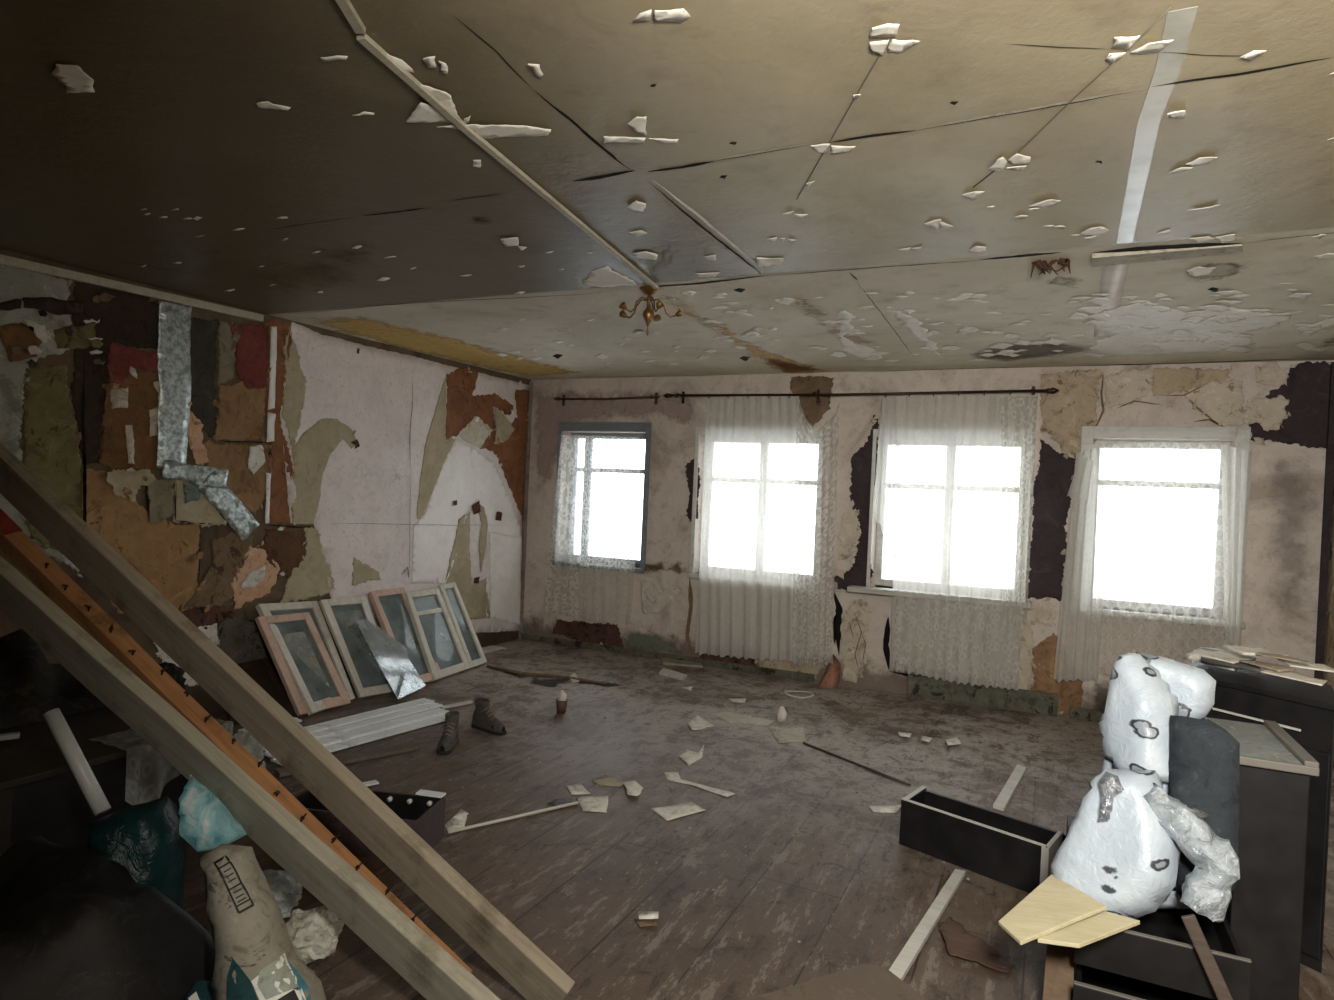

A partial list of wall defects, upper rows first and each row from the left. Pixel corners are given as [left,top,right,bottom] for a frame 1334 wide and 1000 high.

crack [268,193,501,230]
peeling [681,255,784,360]
water stain [686,312,816,372]
crack [458,19,1330,372]
peeling [1187,266,1216,277]
flaking render [81,468,285,646]
spalling [700,414,879,683]
peeling [808,283,1334,716]